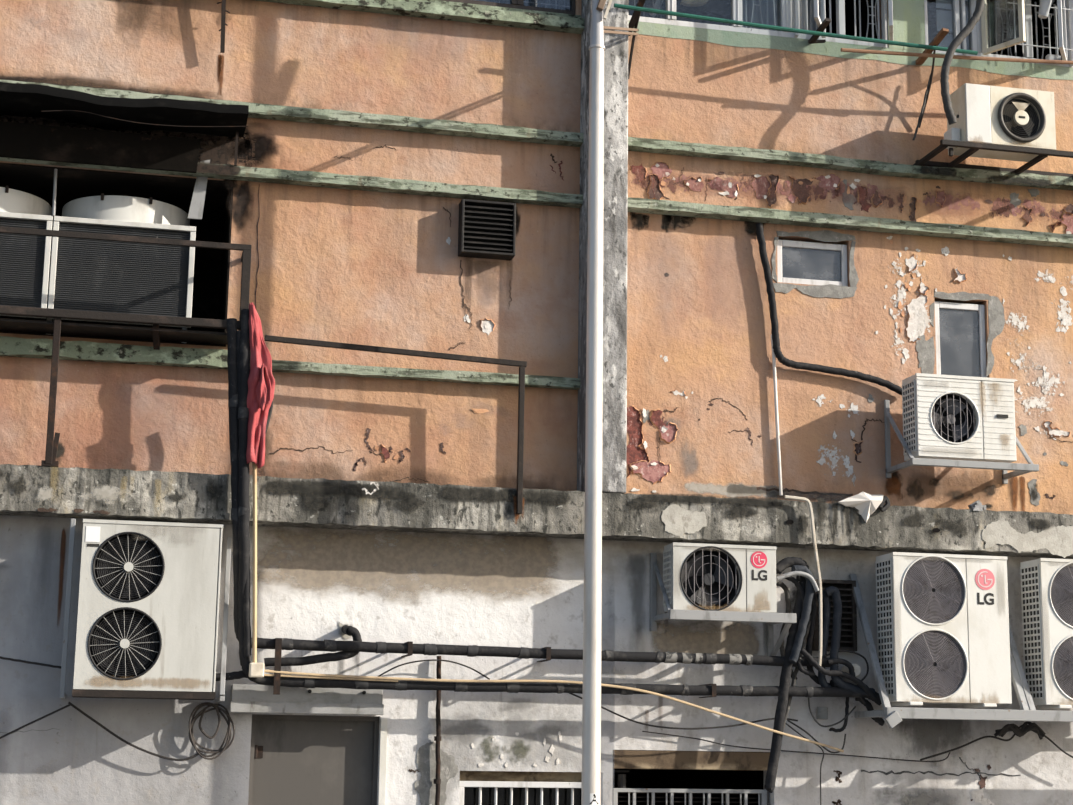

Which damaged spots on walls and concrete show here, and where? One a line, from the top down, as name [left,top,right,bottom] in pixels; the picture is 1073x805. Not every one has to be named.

damp [0,115,277,229]
peeling [630,161,1073,234]
crack [449,260,472,350]
peeling [884,236,937,368]
crack [269,446,353,454]
peeling [626,390,693,484]
crack [698,398,761,446]
crack [851,418,884,463]
damp [265,480,424,513]
damp [630,482,784,519]
damp [257,530,556,597]
peeling [414,742,458,805]